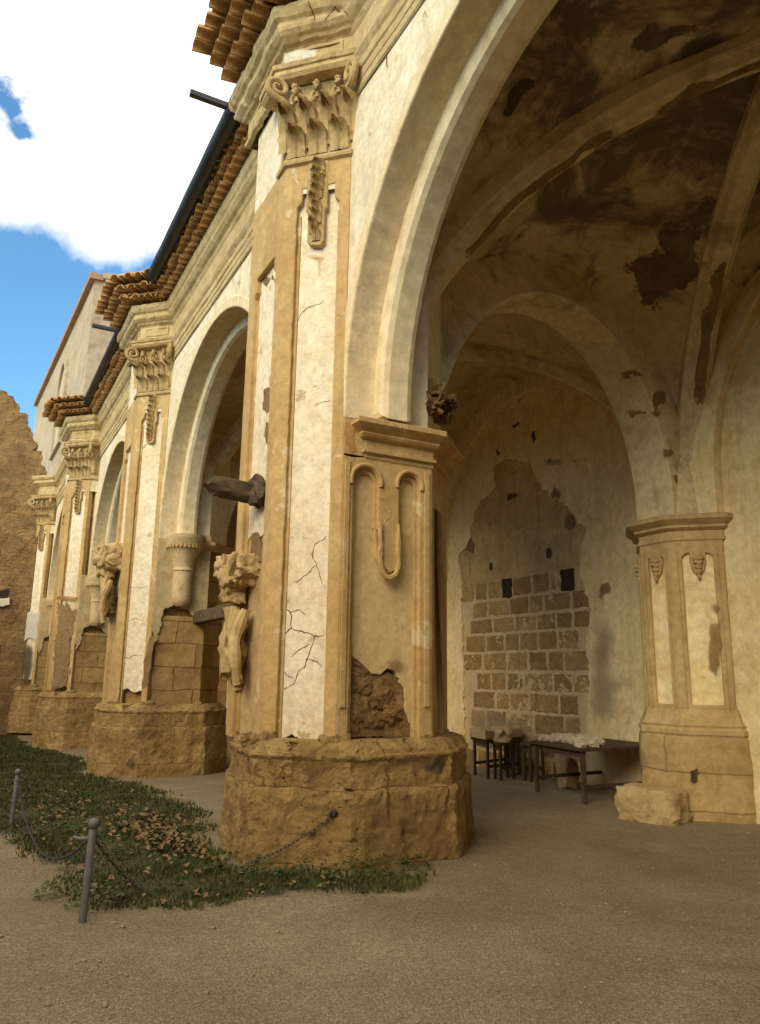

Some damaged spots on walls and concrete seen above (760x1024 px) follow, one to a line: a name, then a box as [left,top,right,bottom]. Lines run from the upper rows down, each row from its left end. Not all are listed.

crack [294,536,326,587]
flaking render [36,602,108,692]
flaking render [142,616,222,704]
crack [284,609,323,689]
spalling [350,658,410,738]
flaking render [459,449,592,782]
damp [709,605,722,673]